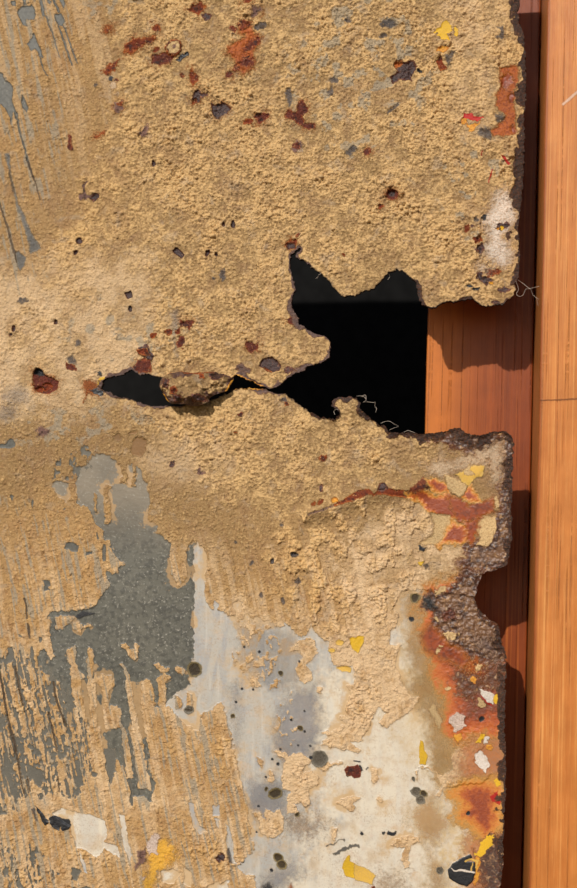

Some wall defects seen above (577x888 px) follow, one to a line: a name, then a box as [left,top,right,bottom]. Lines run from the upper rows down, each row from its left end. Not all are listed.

corrosion [100,24,231,120]
corrosion [225,0,264,78]
corrosion [284,99,315,130]
corrosion [490,0,527,285]
peeling [37,445,499,888]
corrosion [310,396,515,888]